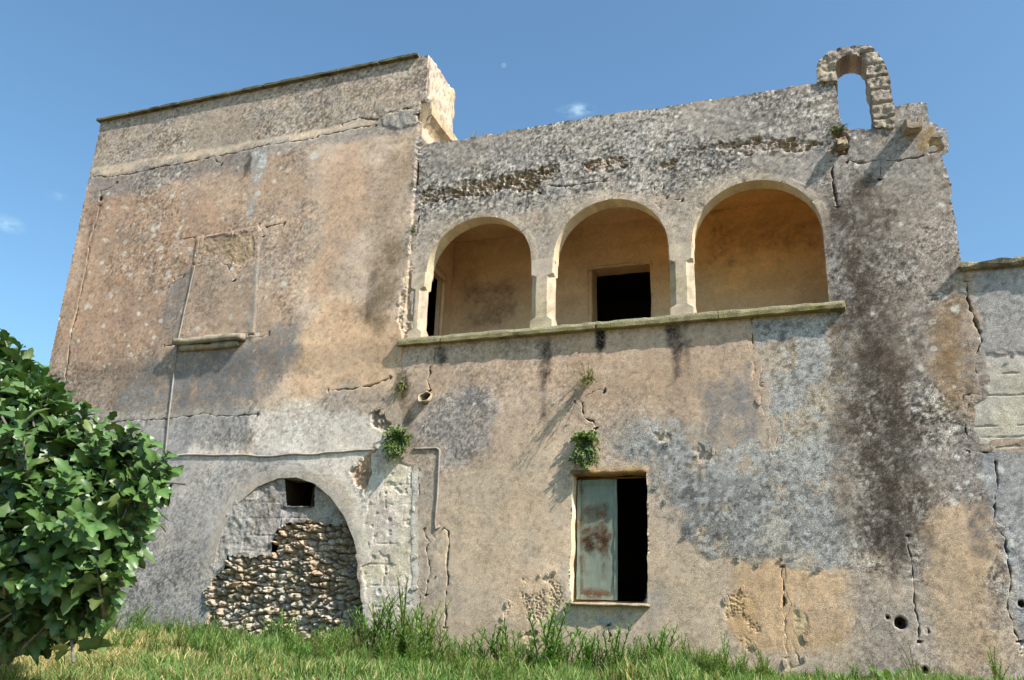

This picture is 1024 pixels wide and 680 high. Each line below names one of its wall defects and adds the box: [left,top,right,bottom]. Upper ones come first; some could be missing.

crack [825,145,939,207]
damp [540,342,551,384]
crack [572,383,606,429]
damp [665,325,689,377]
damp [829,178,928,553]
flaking render [345,405,421,623]
spalling [496,566,573,655]
corrosion [580,505,610,596]
flaking render [595,291,877,676]
crack [775,568,804,667]
crack [899,537,928,640]
crack [957,282,1024,642]